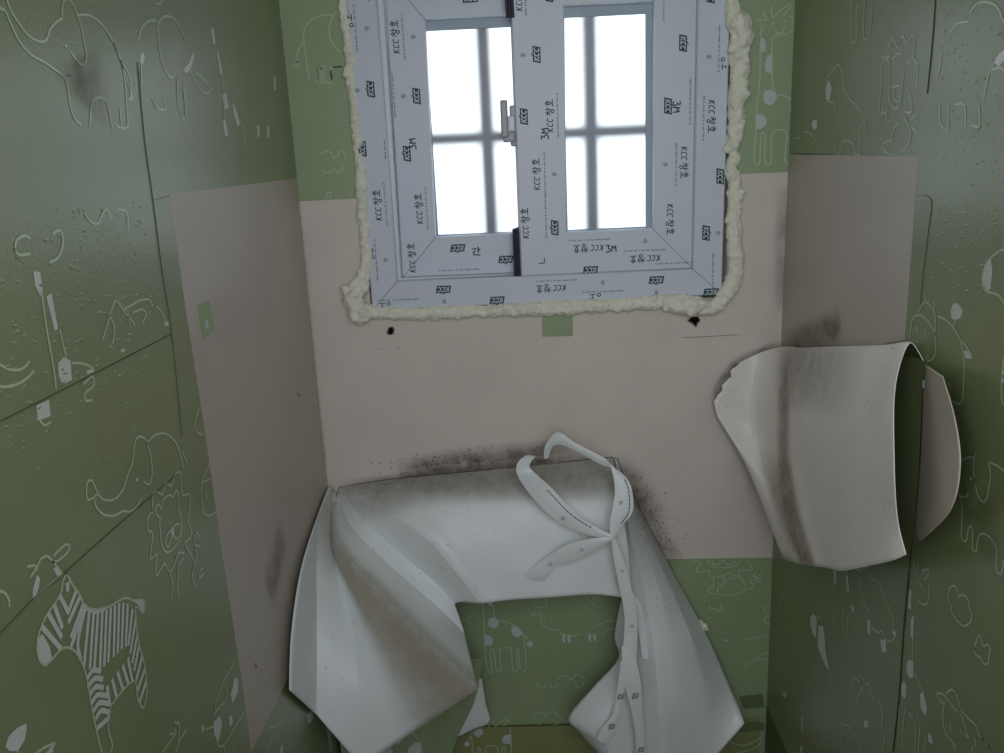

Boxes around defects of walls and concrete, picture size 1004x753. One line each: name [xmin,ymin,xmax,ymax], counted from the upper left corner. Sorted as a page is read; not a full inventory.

water stain [357,445,521,495]
water stain [530,447,687,564]